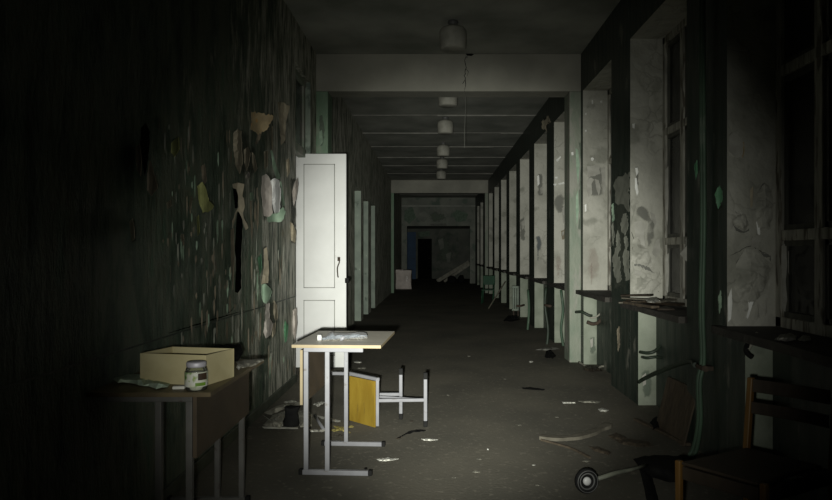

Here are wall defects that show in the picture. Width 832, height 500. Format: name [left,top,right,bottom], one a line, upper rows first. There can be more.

peeling [162,102,298,383]
peeling [571,143,669,293]